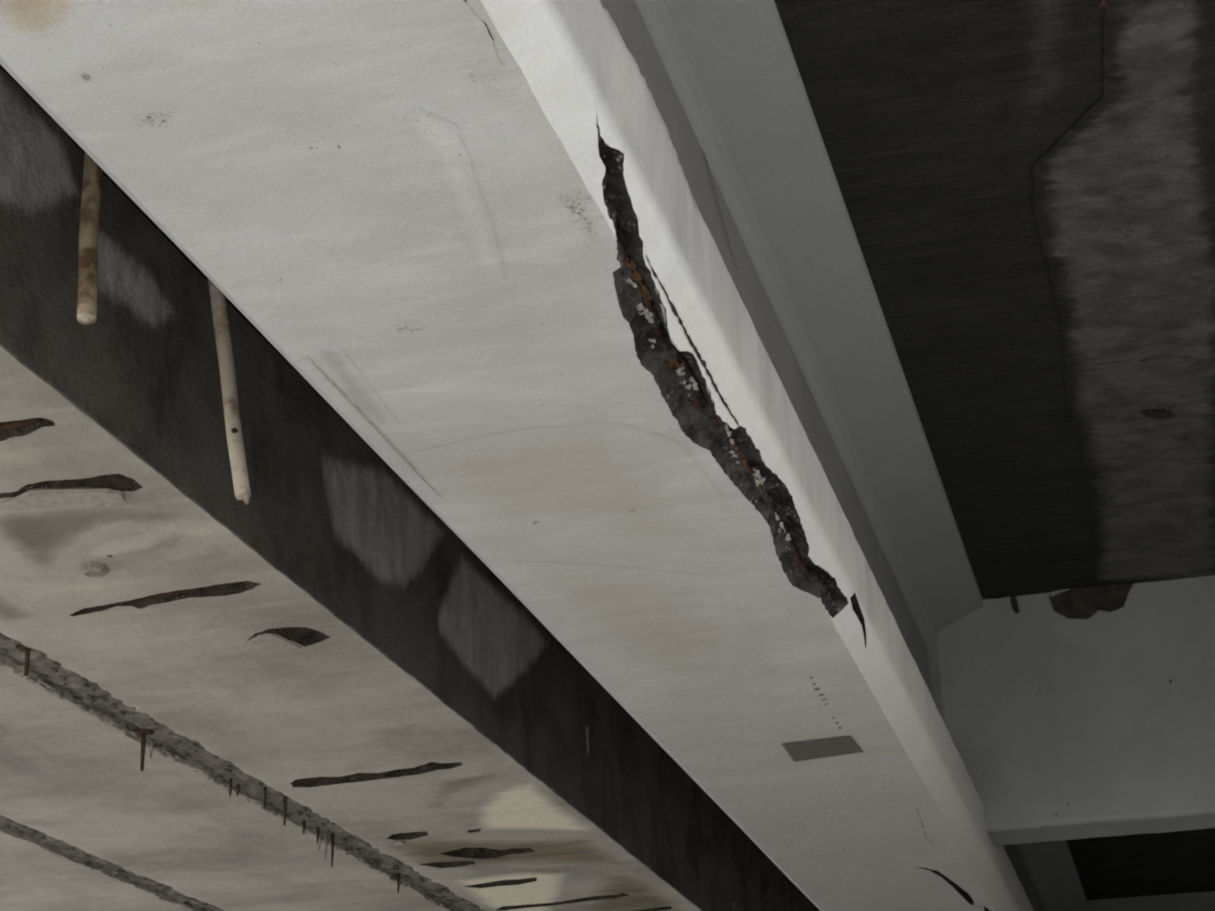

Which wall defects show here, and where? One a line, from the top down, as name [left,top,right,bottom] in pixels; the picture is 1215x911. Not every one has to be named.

spalling [594,100,848,618]
spalling [0,418,55,441]
spalling [0,474,143,510]
spalling [70,581,261,617]
peeling [1050,583,1133,619]
spalling [247,627,331,651]
spalling [290,762,463,787]
spalling [387,831,428,846]
spalling [419,828,535,868]
crack [914,807,990,911]
spalling [464,877,537,888]
spalling [496,893,630,910]